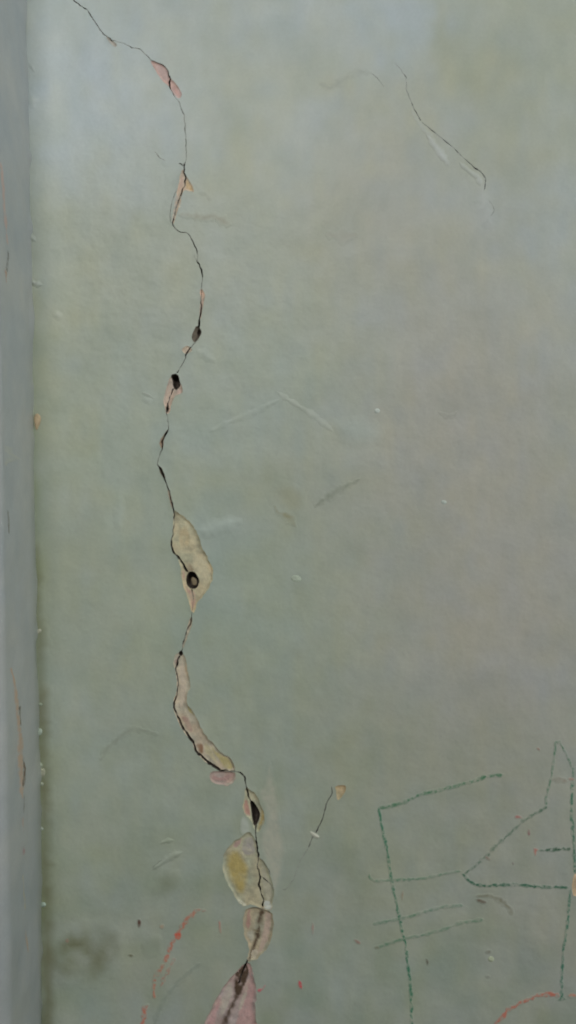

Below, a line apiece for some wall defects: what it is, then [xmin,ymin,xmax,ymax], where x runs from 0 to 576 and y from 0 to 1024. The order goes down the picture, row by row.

peeling [151,61,182,98]
crack [371,63,494,214]
crack [73,0,251,800]
flaking render [168,490,236,786]
peeling [204,759,286,1024]
crack [255,785,333,906]